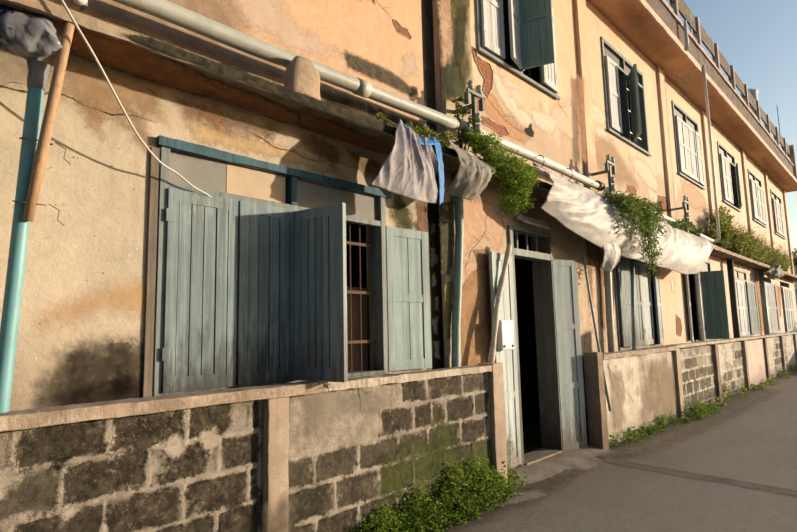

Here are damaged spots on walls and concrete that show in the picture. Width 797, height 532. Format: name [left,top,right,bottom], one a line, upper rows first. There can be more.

crack [0,82,156,127]
water stain [93,0,423,135]
water stain [440,144,458,157]
water stain [443,0,470,99]
peeling [471,45,580,144]
water stain [37,342,144,408]
water stain [0,368,488,532]